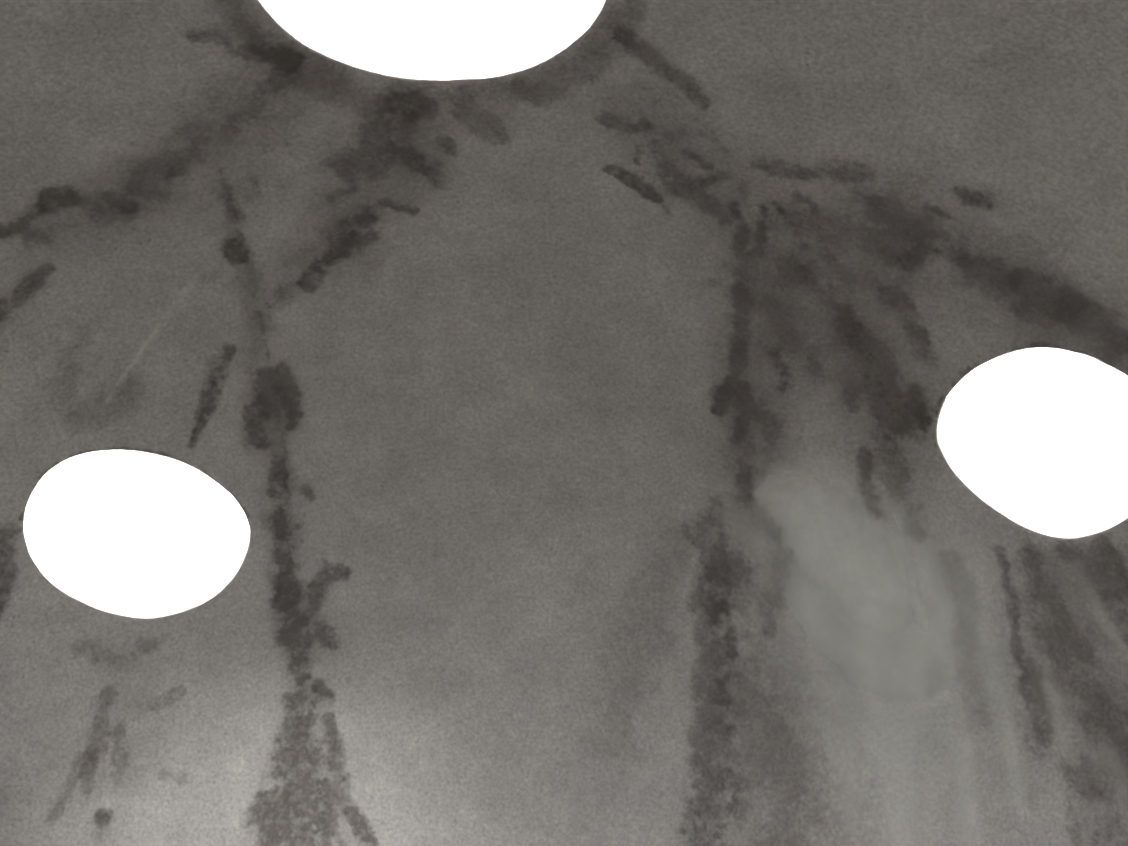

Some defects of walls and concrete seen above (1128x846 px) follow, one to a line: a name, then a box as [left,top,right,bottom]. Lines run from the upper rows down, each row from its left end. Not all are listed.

damp [298,200,419,292]
damp [603,165,702,212]
damp [954,249,1128,373]
damp [190,346,236,448]
damp [243,363,303,449]
damp [711,270,754,501]
damp [0,463,60,611]
damp [767,447,948,668]
damp [247,470,377,846]
damp [94,809,110,827]